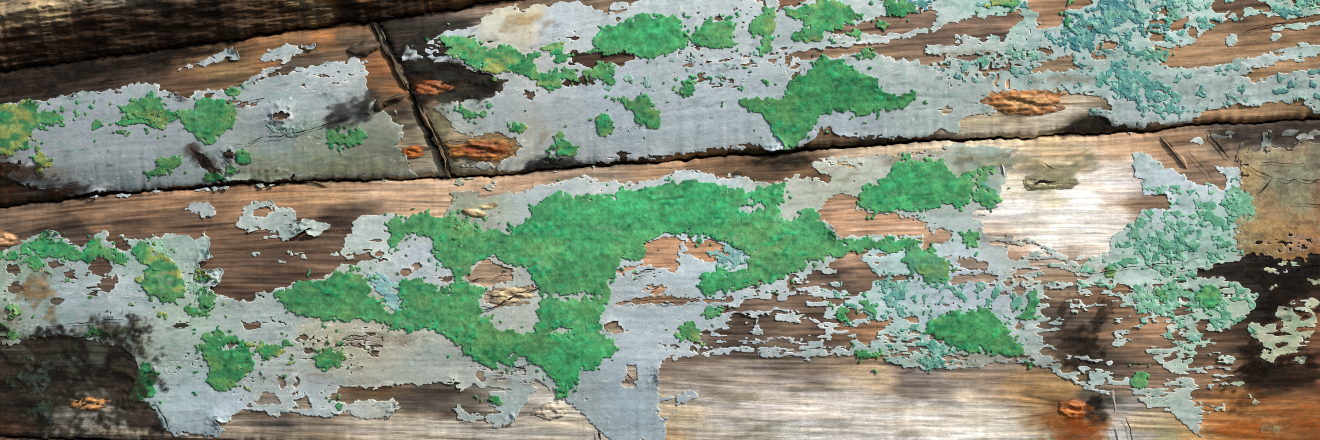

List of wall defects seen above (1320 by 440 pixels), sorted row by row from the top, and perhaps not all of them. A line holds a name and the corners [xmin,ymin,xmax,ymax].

peeling [0,43,418,218]
crack [344,12,461,177]
peeling [402,0,1320,172]
peeling [0,129,1320,440]
leakage [1221,258,1320,403]